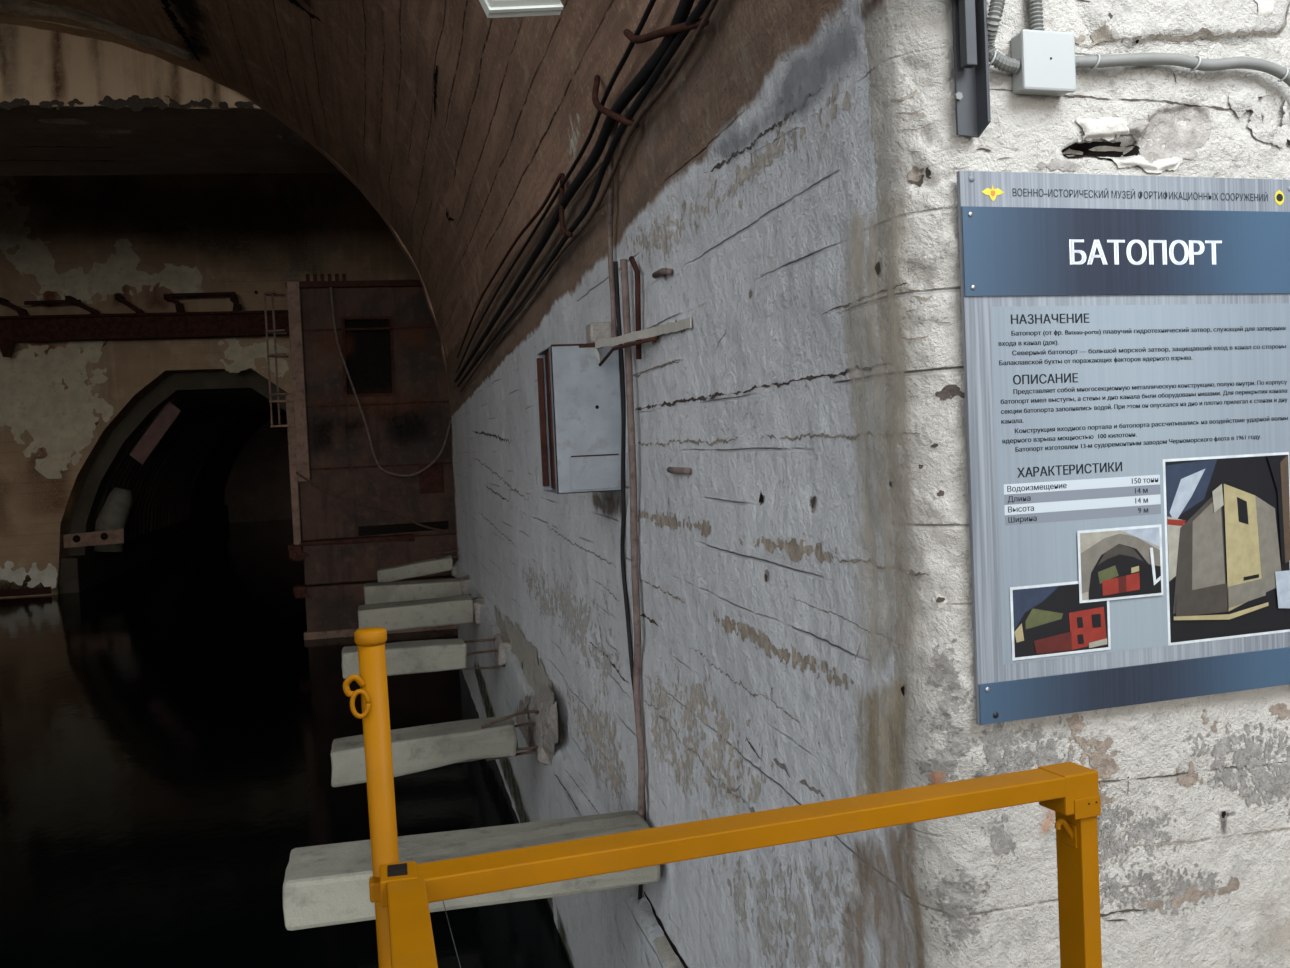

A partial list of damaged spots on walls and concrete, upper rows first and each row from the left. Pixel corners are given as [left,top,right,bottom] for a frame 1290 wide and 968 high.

crack [161,0,200,62]
crack [289,0,321,22]
spalling [1037,99,1212,174]
peeling [0,176,214,305]
crack [633,280,951,410]
peeling [0,341,114,479]
crack [636,431,920,447]
damp [0,561,61,591]
peeling [515,558,627,811]
peeling [643,662,784,820]